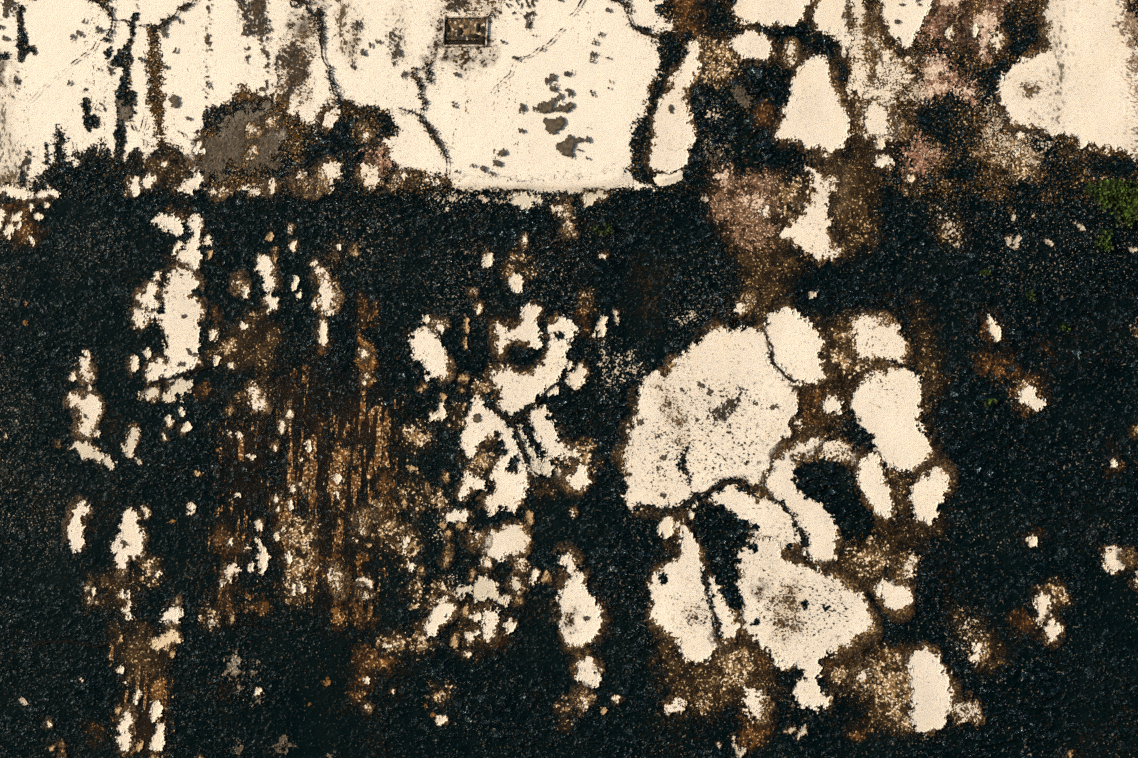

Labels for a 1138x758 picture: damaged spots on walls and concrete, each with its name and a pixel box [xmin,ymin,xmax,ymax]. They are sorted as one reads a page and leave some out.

water stain [0,0,204,204]
crack [28,0,196,102]
water stain [201,0,212,130]
crack [281,0,451,190]
water stain [236,0,1138,234]
spalling [123,83,417,443]
peeling [54,350,142,471]
peeling [348,231,997,742]
crack [631,441,812,556]
peeling [82,503,184,758]
crack [699,556,728,642]
peeling [1032,576,1076,650]